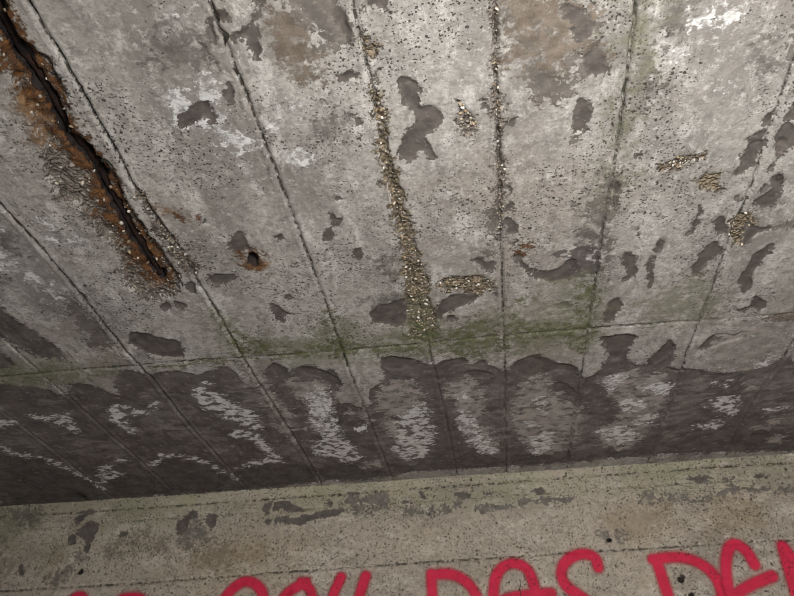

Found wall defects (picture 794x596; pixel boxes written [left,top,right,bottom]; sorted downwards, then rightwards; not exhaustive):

water stain [285,147,320,178]
water stain [572,169,628,263]
water stain [0,199,115,350]
water stain [0,299,66,371]
water stain [0,319,794,587]